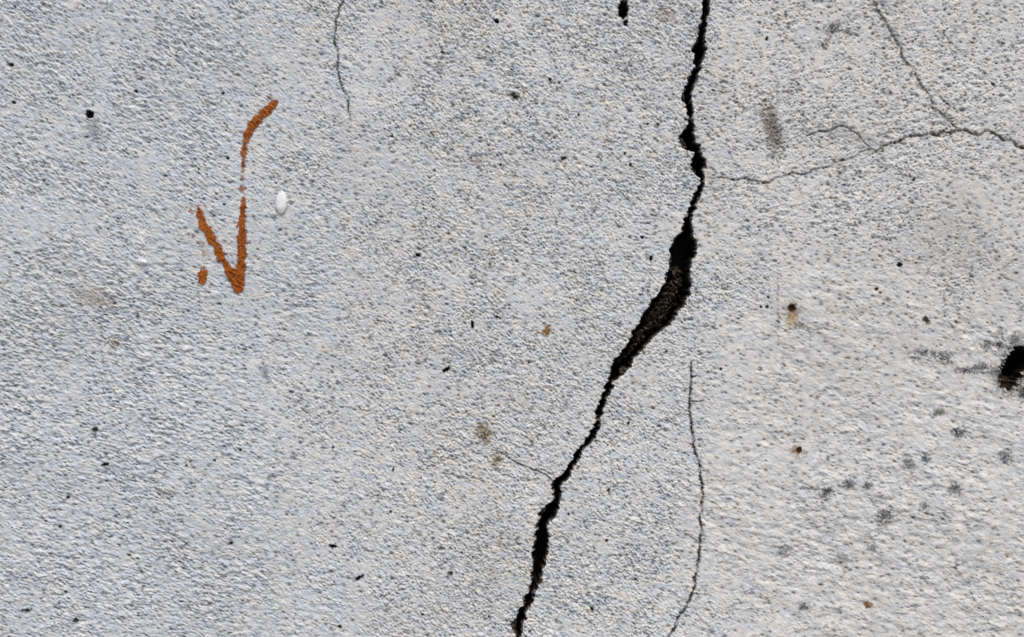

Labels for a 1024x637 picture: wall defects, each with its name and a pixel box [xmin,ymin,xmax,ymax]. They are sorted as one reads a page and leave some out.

crack [333,1,349,111]
crack [507,0,1024,637]
spalling [994,346,1024,403]